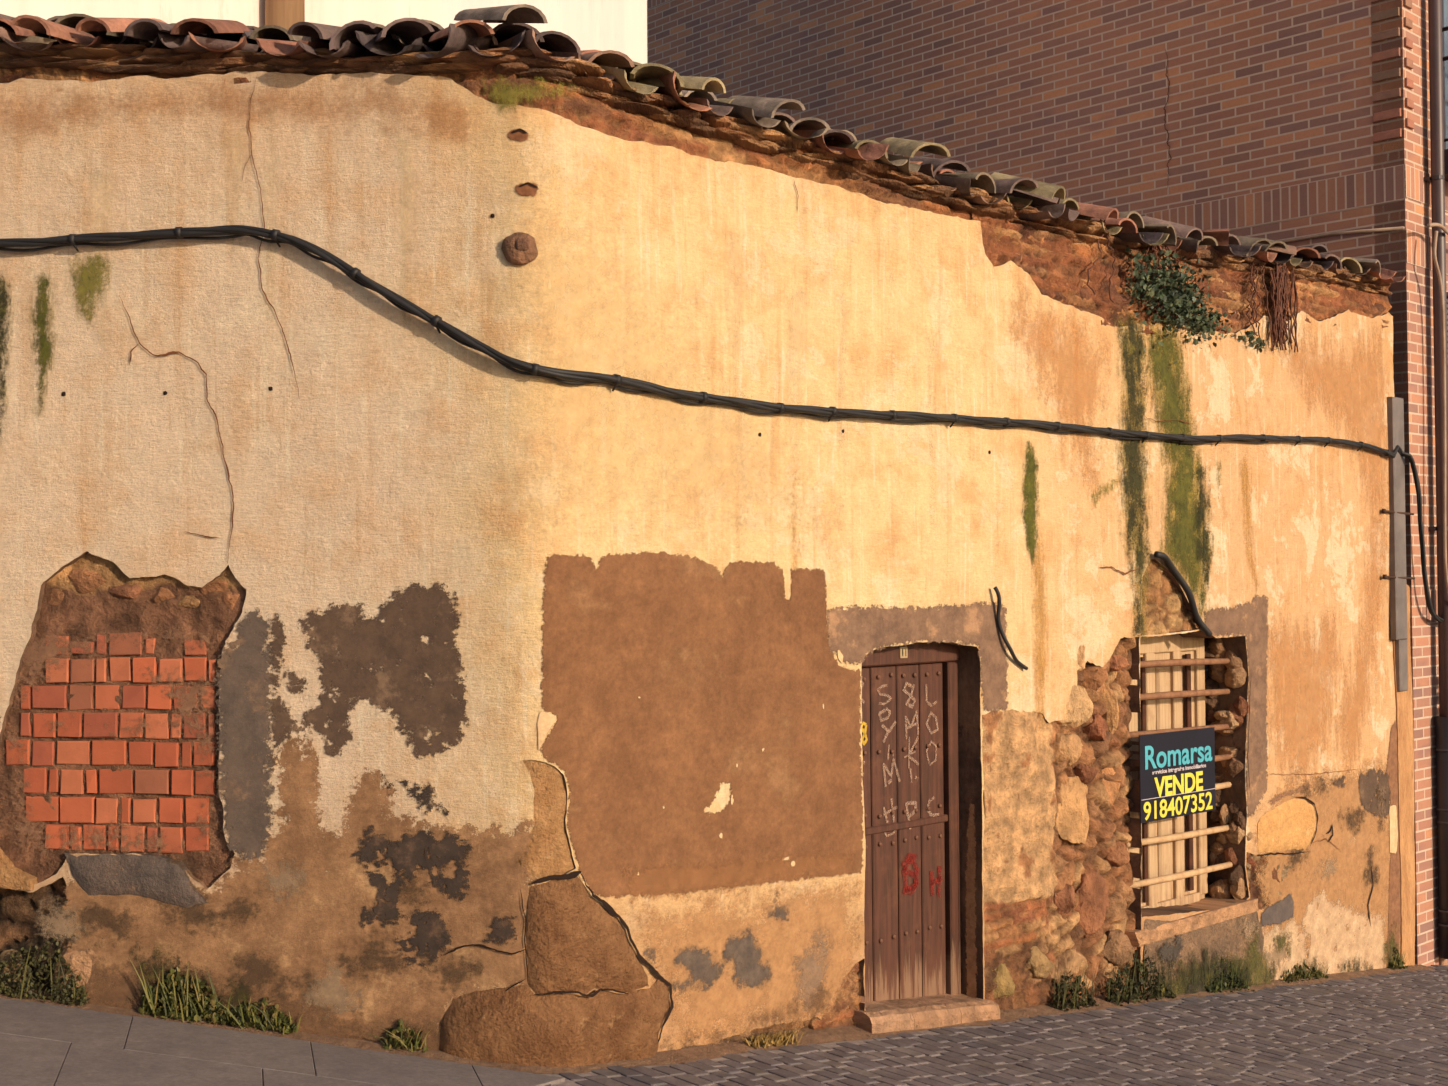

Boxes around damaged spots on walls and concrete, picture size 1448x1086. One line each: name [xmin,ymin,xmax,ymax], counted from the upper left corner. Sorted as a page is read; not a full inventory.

leakage [0,278,11,433]
leakage [33,277,52,404]
leakage [70,256,108,320]
crack [120,297,234,564]
crack [243,74,299,396]
leakage [1092,315,1213,636]
spalling [972,212,1389,341]
spalling [0,553,246,997]
spalling [982,559,1199,1010]
leakage [155,852,259,936]
leakage [40,902,484,1050]